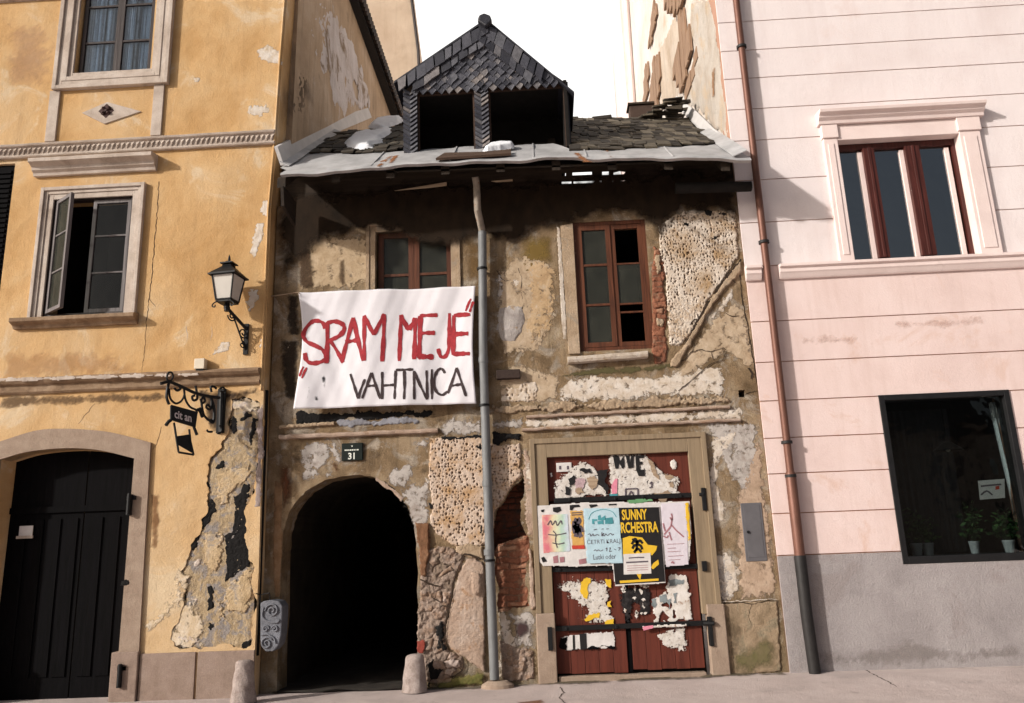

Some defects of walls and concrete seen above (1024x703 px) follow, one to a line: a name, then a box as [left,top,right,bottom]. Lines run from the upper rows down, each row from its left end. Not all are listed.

peeling [257,44,283,65]
peeling [312,3,370,117]
peeling [660,0,728,136]
peeling [250,200,271,257]
crack [142,186,159,367]
peeling [144,398,283,649]
peeling [326,443,341,477]
peeling [376,465,413,501]
flaking render [494,463,531,550]
peeling [707,432,736,521]
peeling [717,552,742,600]